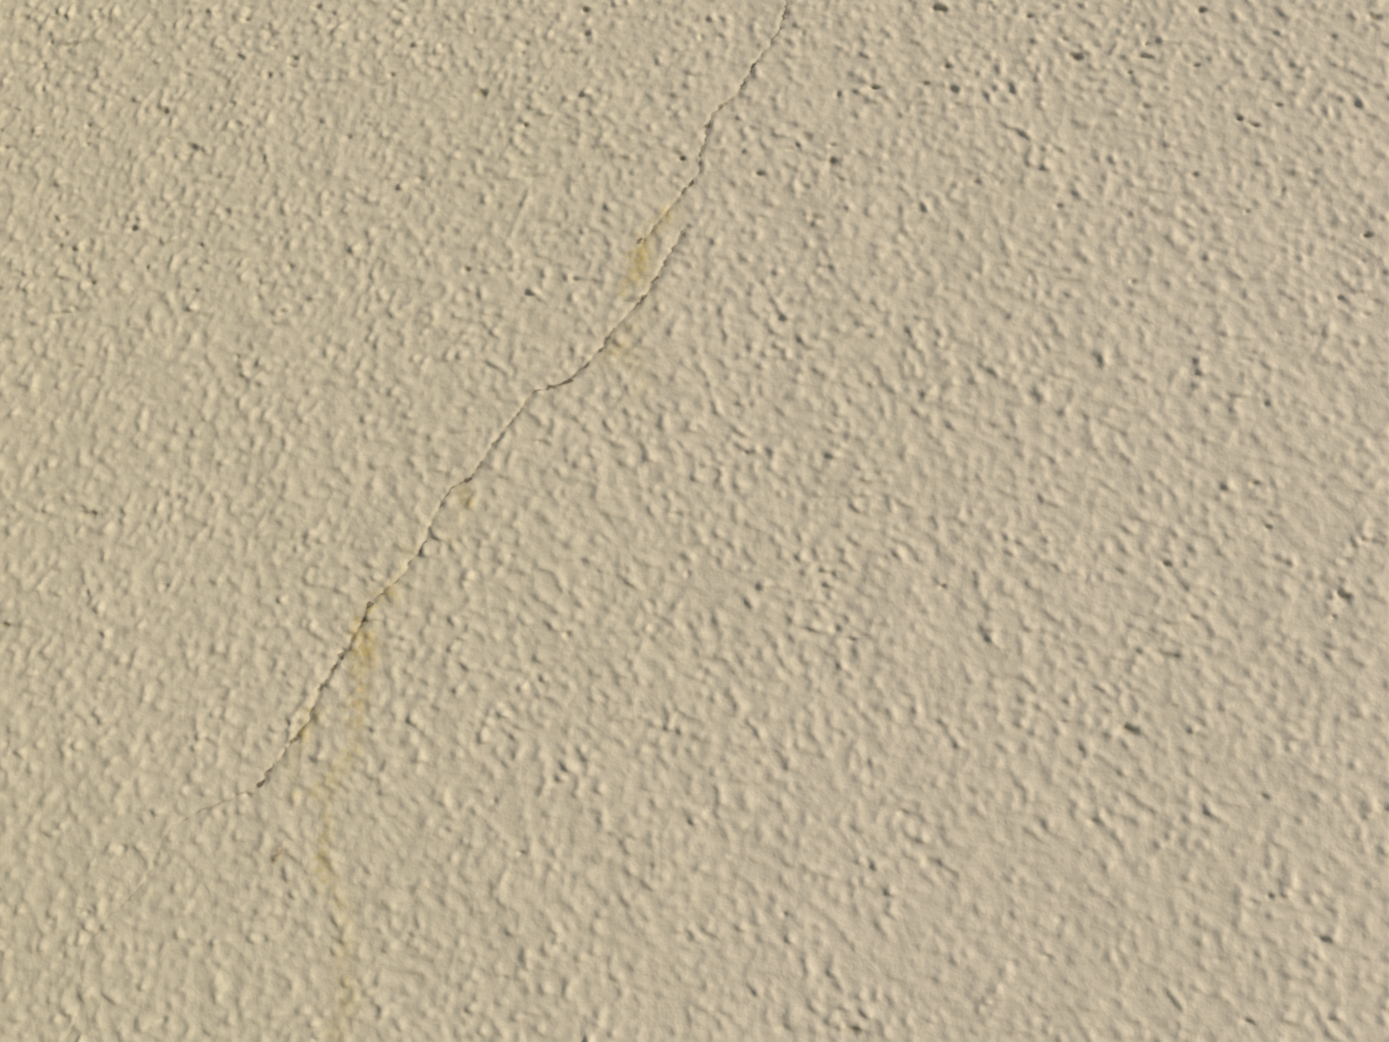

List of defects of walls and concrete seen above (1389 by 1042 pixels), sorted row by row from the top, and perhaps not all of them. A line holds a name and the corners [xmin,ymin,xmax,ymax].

crack [63,0,789,1042]